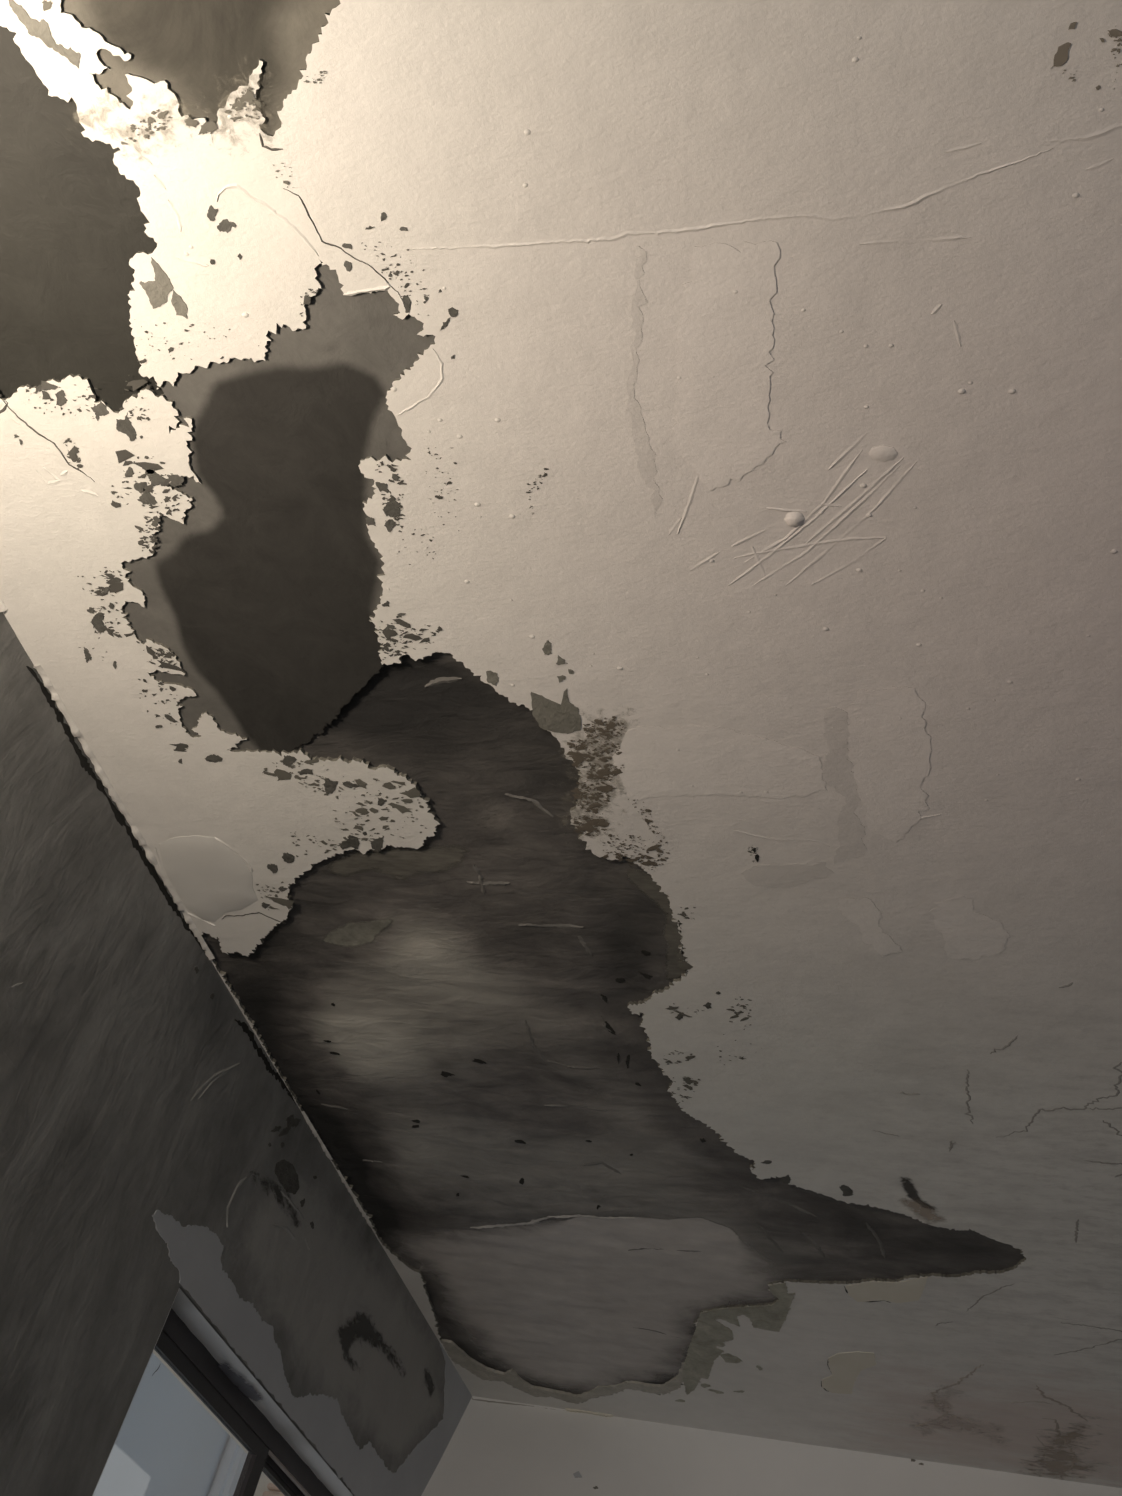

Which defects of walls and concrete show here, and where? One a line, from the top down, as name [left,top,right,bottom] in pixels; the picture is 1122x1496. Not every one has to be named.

peeling [8,0,81,68]
peeling [62,0,341,135]
peeling [1054,22,1077,82]
peeling [440,307,459,330]
peeling [0,26,442,753]
peeling [542,640,574,683]
leakage [566,716,669,870]
flaking render [33,650,1024,1496]
crack [949,1035,1122,1177]
leakage [901,1178,935,1210]
leakage [338,1312,405,1375]
leakage [217,1363,262,1401]